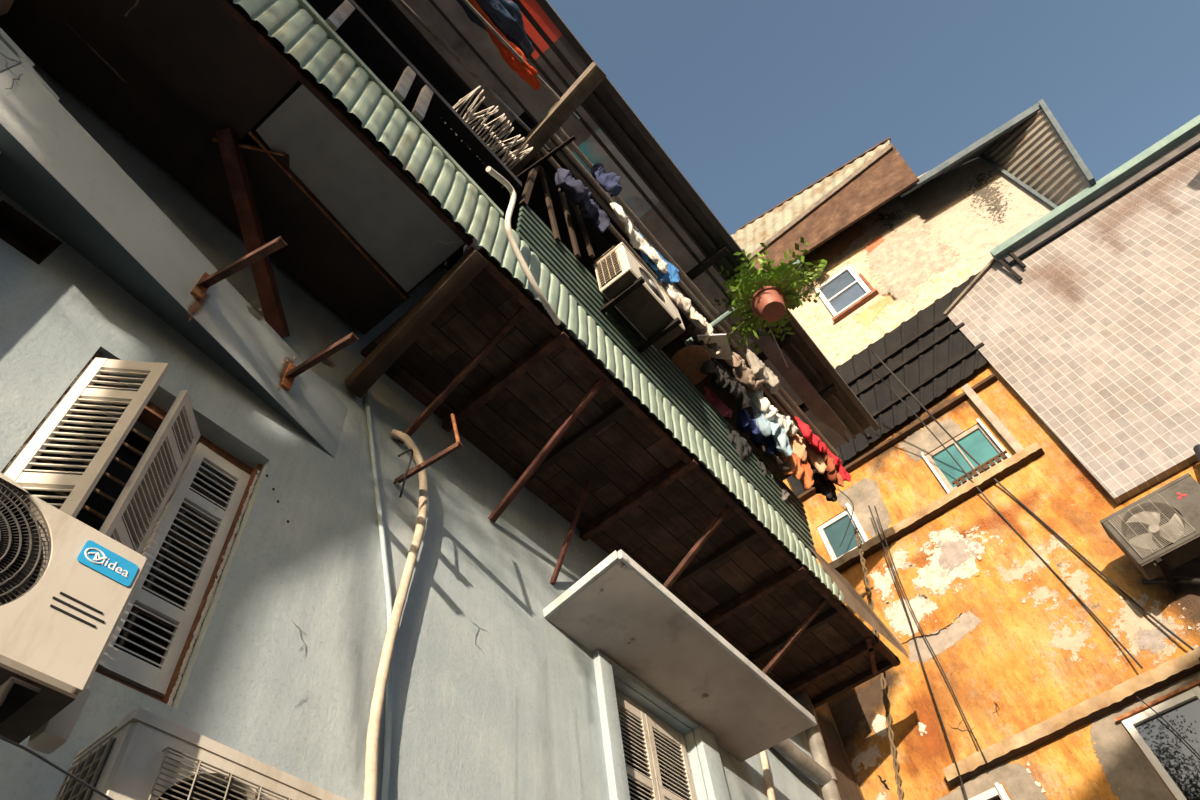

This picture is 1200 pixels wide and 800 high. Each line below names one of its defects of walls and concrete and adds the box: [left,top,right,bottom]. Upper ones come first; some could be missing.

crack [0,52,24,89]
water stain [958,167,1012,230]
flaking render [800,197,961,326]
peeling [862,526,1200,671]
peeling [851,714,888,783]